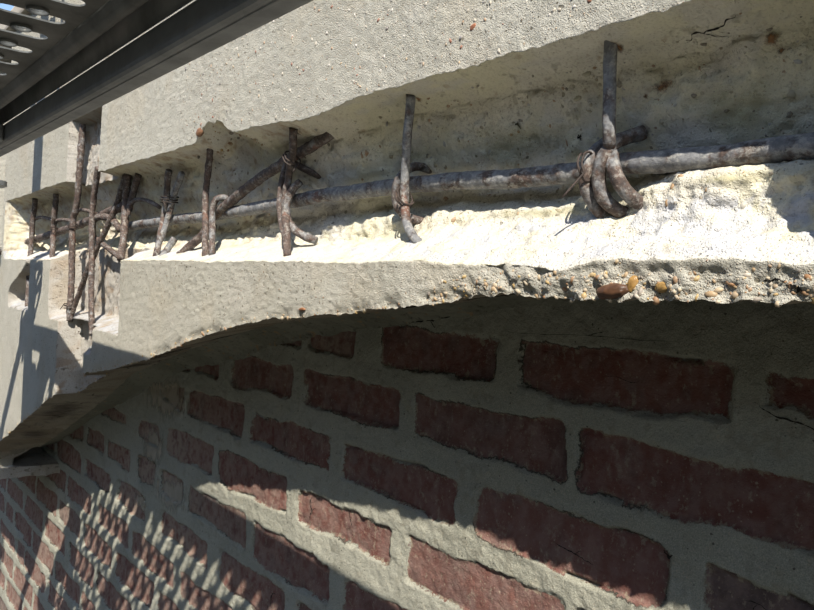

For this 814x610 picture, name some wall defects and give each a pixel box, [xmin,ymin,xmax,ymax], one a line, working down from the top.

crack [686,15,736,41]
spalling [3,0,814,395]
crack [757,403,814,430]